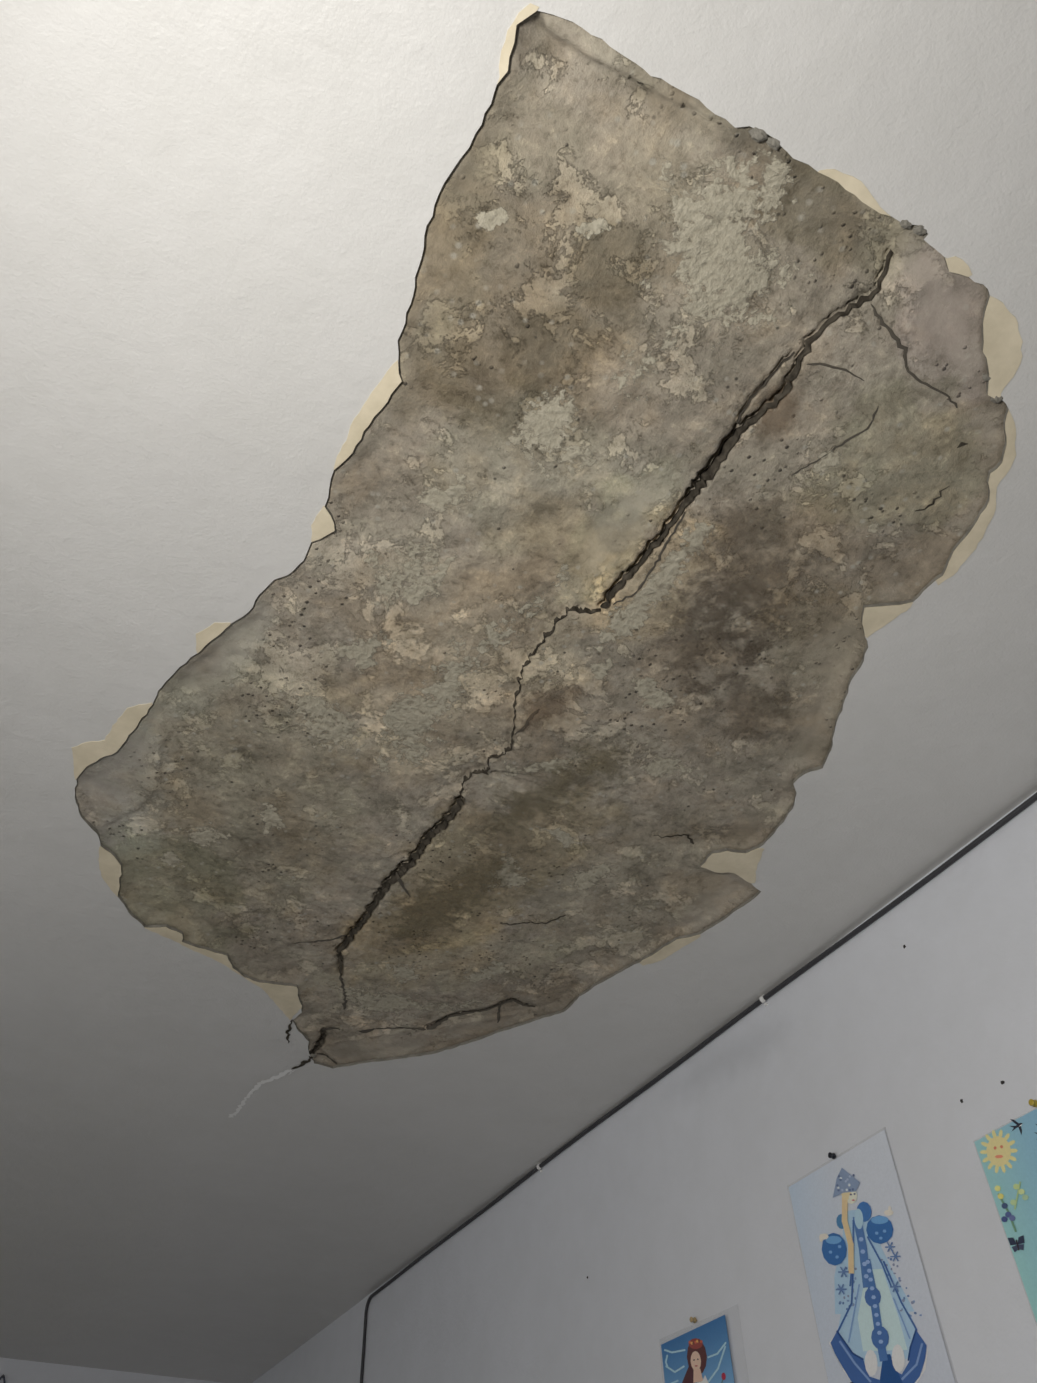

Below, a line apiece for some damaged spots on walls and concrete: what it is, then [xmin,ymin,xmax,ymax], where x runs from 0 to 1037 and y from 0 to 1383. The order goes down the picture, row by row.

flaking render [72,3,1023,1069]
crack [228,249,958,1118]